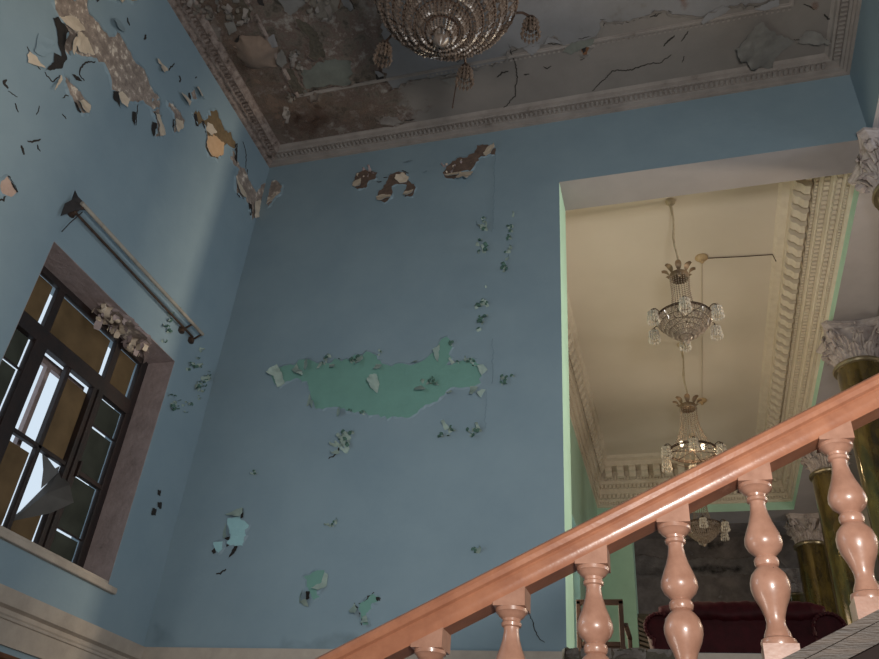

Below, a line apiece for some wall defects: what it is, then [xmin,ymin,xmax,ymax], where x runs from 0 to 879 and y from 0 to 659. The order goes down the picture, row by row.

crack [3,79,40,115]
peeling [27,0,284,221]
flaking render [267,0,356,124]
crack [497,43,551,107]
crack [594,31,689,90]
peeling [0,174,18,202]
crack [21,139,41,155]
peeling [351,160,417,204]
peeling [441,142,497,181]
peeling [266,335,487,421]
peeling [212,507,251,557]